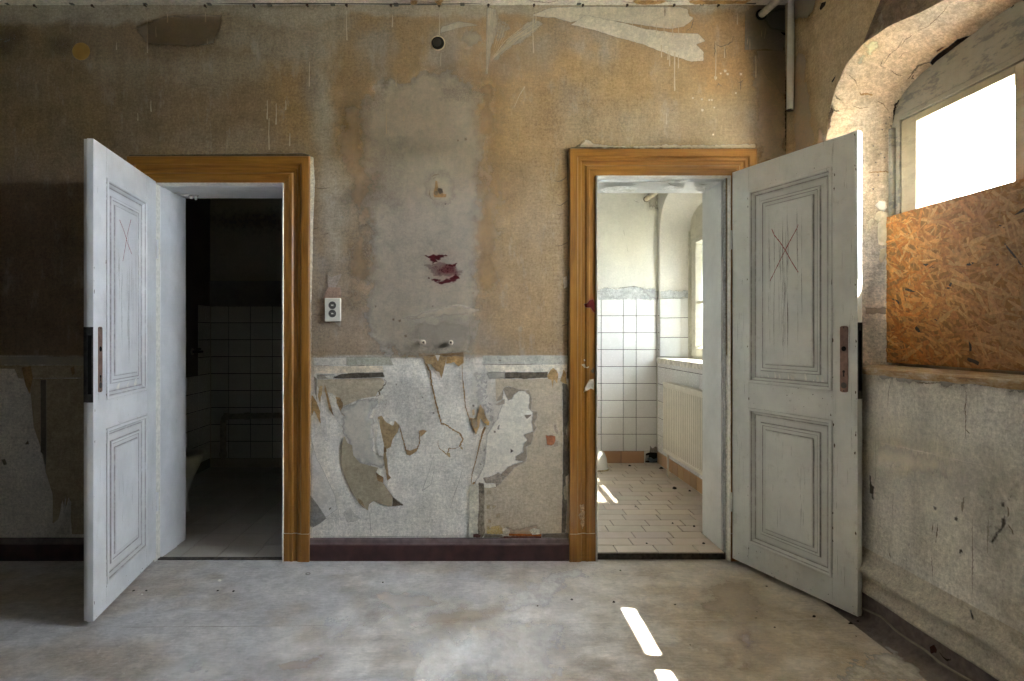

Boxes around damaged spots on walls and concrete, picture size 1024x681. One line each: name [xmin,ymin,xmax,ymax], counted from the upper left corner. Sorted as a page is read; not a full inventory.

peeling [483,356,568,379]
peeling [546,421,569,447]